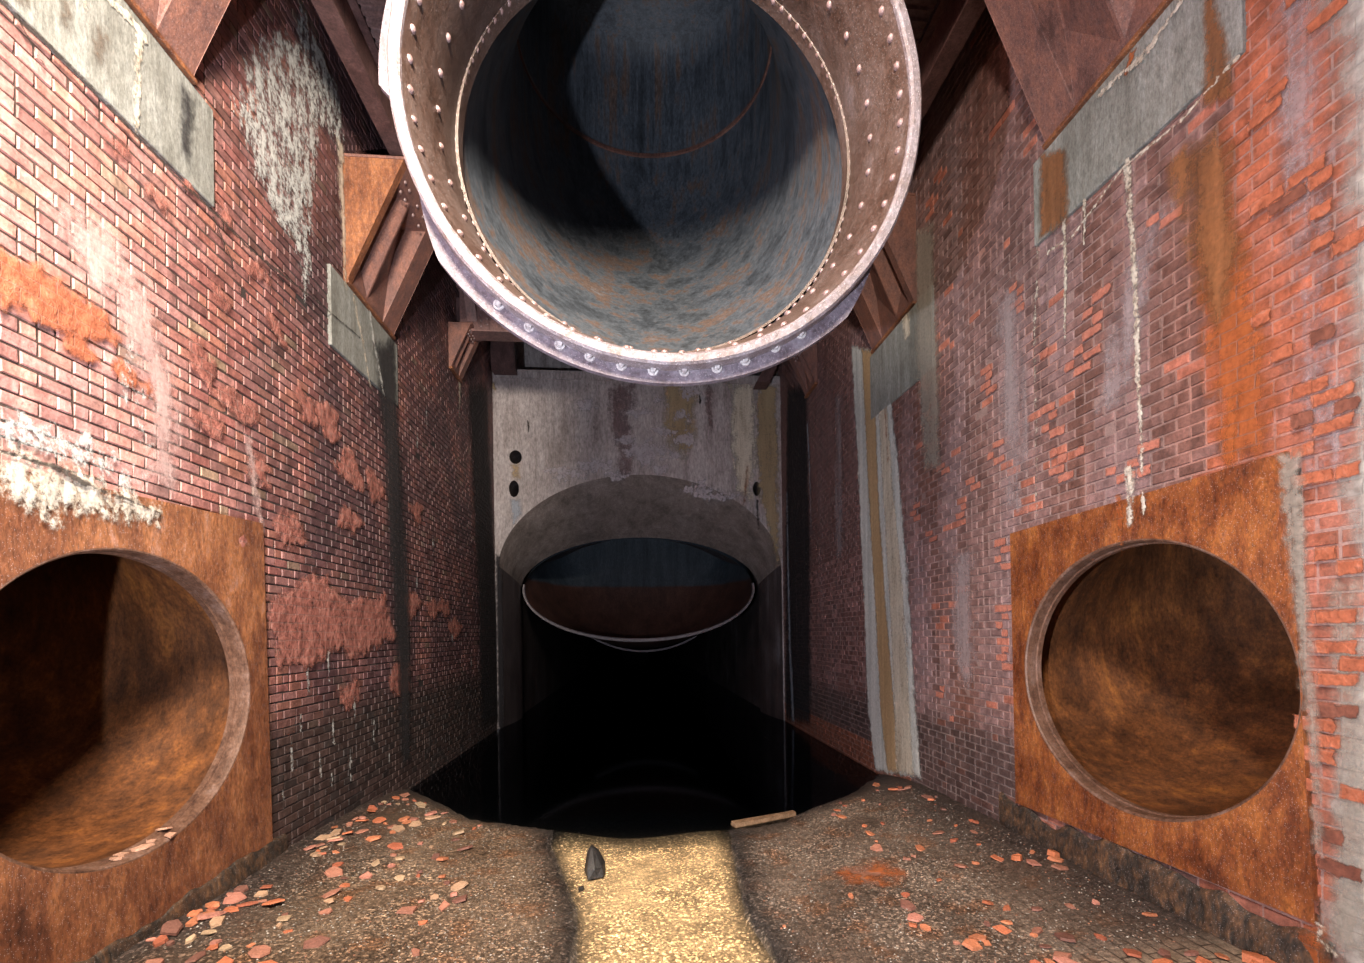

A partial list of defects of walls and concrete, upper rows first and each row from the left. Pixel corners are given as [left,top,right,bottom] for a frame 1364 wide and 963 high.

water stain [1098,0,1183,98]
spalling [1248,152,1364,257]
efflorescence [64,211,173,481]
water stain [233,7,418,767]
water stain [1037,55,1240,537]
rust [1168,130,1269,469]
spalling [1289,375,1361,458]
efflorescence [0,412,162,529]
spalling [1315,640,1364,686]
spalling [1294,702,1359,766]
spalling [1317,826,1362,883]
rust [1298,923,1338,963]